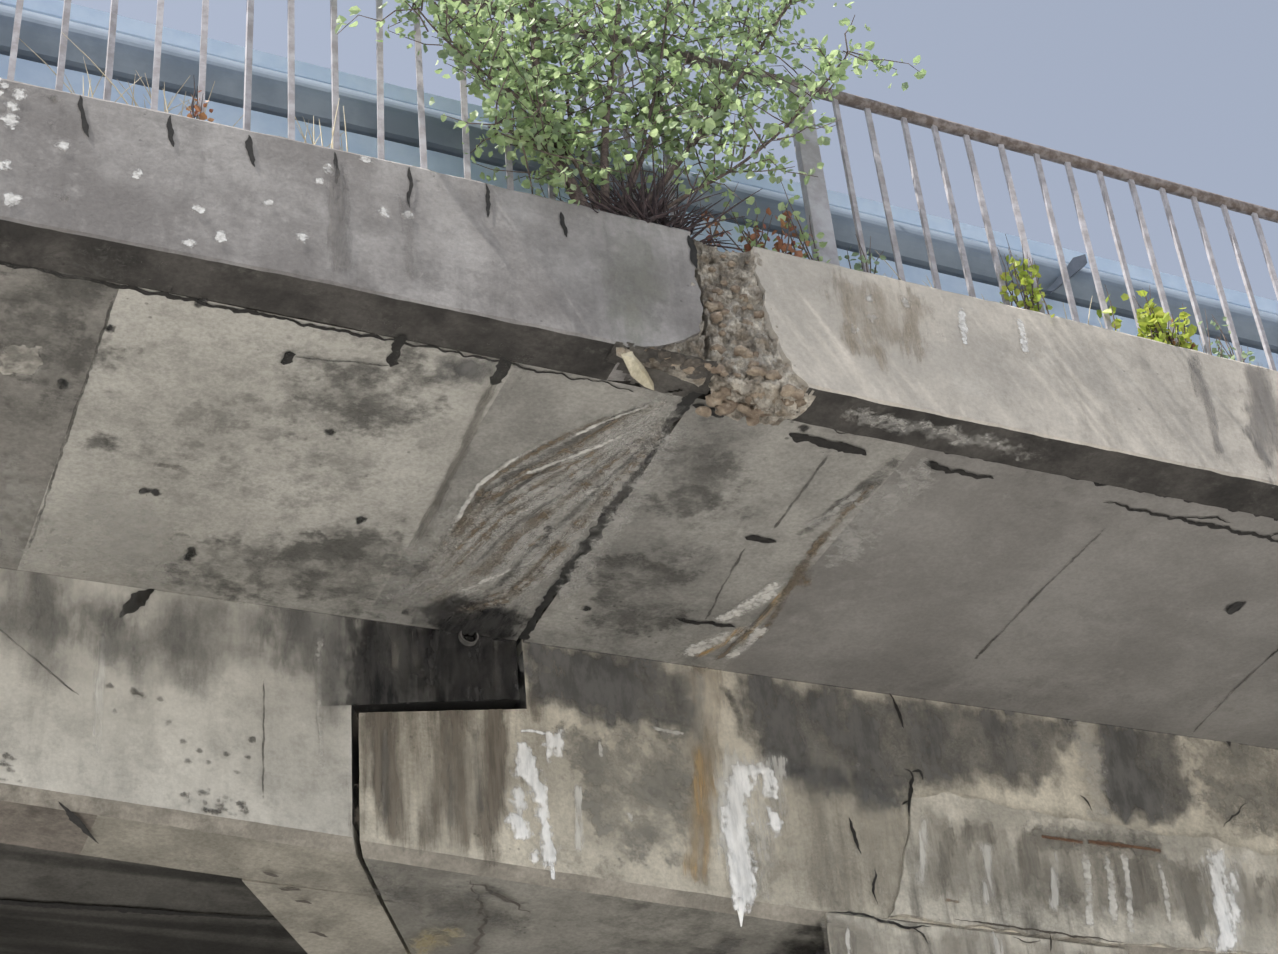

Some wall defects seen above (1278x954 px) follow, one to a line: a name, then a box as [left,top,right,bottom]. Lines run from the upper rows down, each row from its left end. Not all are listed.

spalling [605,239,816,426]
crack [519,392,702,640]
crack [1069,477,1278,543]
leakage [0,572,64,648]
leakage [161,607,206,663]
leakage [248,532,694,880]
leakage [718,753,786,954]
crack [902,769,923,817]
crack [828,818,1124,952]